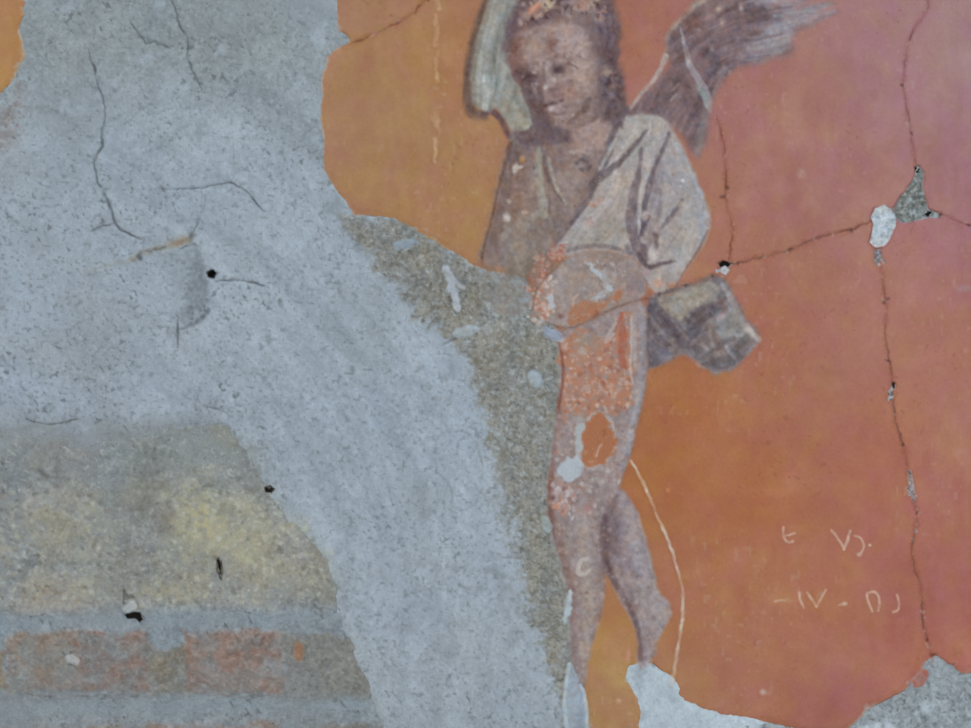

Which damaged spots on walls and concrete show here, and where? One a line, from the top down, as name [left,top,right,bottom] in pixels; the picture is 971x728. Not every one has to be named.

crack [127,0,204,94]
crack [899,0,932,167]
crack [80,47,144,268]
crack [157,178,268,233]
crack [521,114,872,334]
spalling [869,167,941,267]
spalling [174,245,217,332]
crack [214,276,267,291]
spalling [440,263,483,340]
crack [878,259,938,665]
spalling [121,599,138,614]
spalling [63,653,81,666]